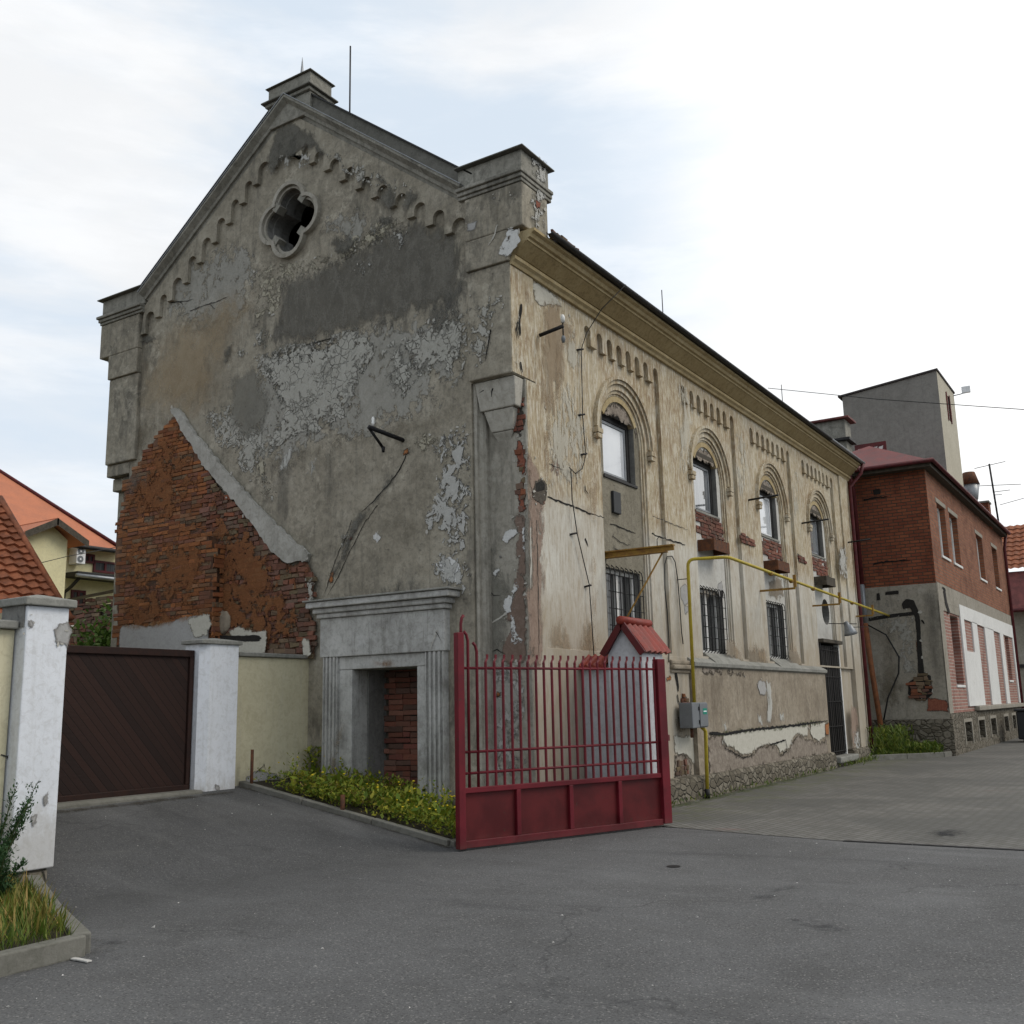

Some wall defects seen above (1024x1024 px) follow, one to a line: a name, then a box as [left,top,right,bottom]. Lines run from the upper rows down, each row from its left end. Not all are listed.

flaking render [499,227,520,256]
flaking render [112,207,504,659]
crack [325,454,407,596]
flaking render [739,533,756,548]
peeling [493,388,592,779]
flaking render [905,672,948,712]
flaking render [708,722,829,774]